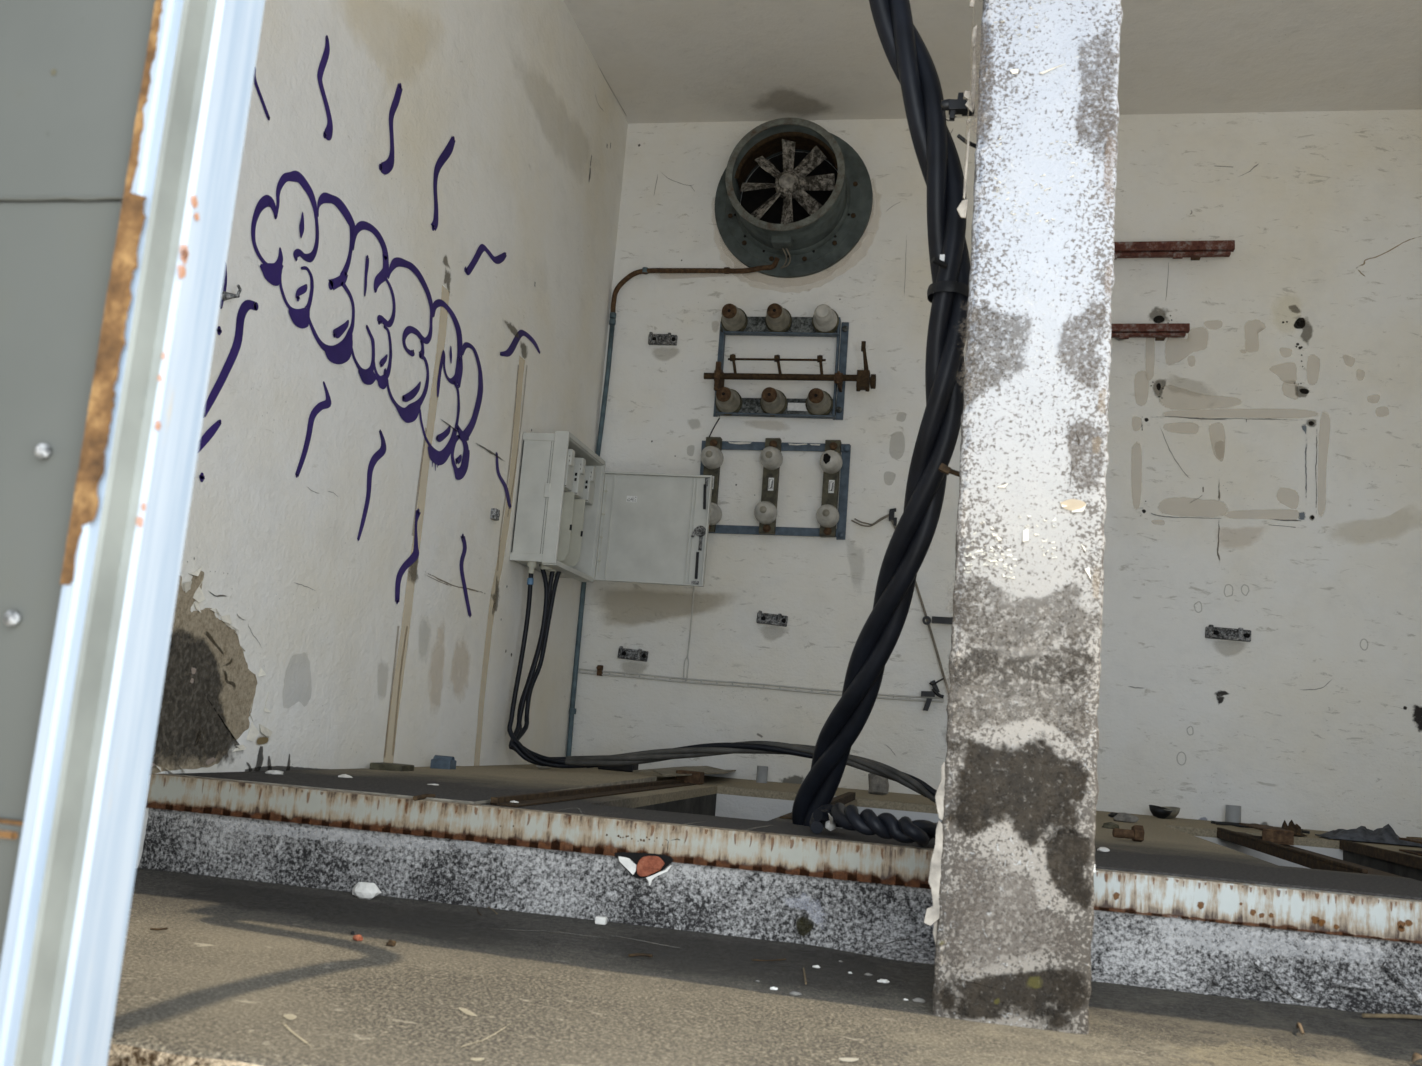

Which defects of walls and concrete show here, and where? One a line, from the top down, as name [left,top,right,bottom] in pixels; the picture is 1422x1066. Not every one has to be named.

rust [60,0,163,585]
rust [178,244,189,279]
spalling [1150,380,1166,398]
spalling [1282,305,1312,397]
peeling [150,567,272,775]
leakage [946,576,1100,909]
rust [146,783,931,889]
leakage [933,854,1090,1029]
rust [1094,872,1422,944]